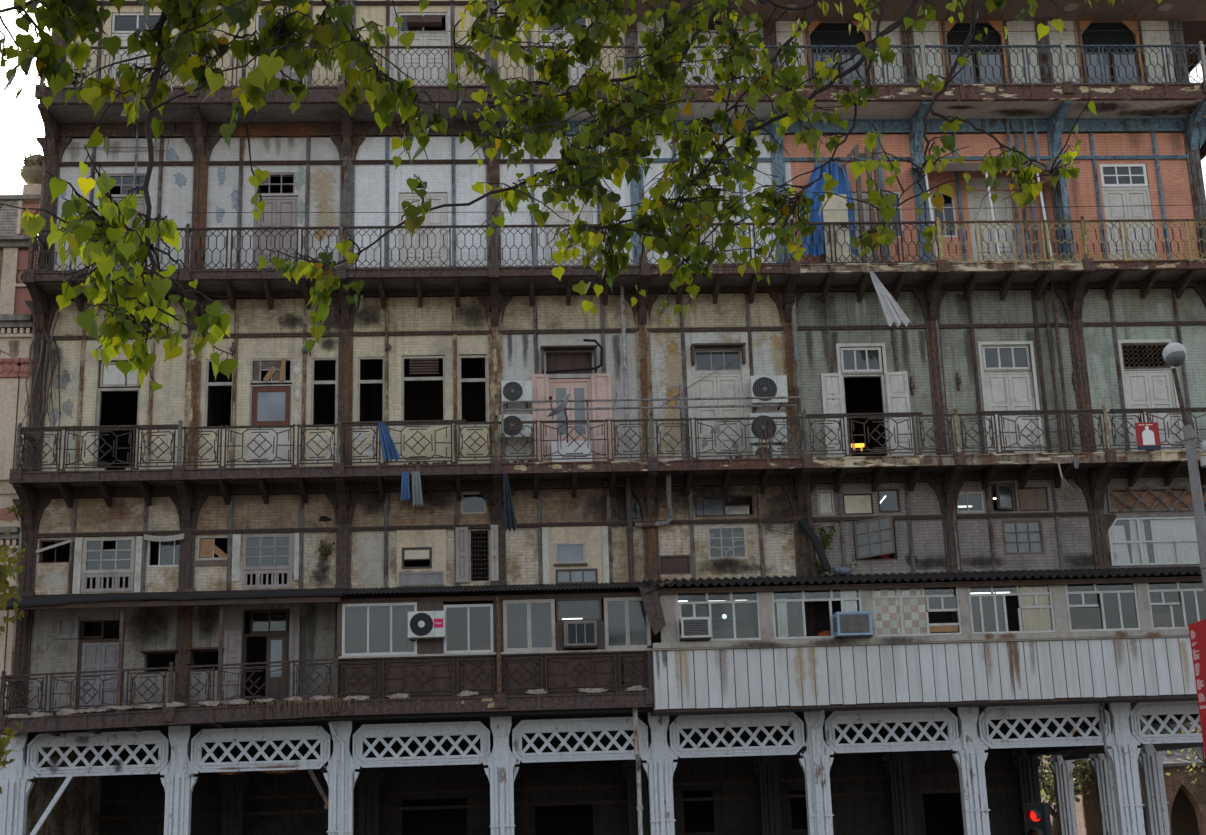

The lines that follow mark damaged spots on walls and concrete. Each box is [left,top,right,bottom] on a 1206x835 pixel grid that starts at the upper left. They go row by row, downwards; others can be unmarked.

corrosion [986,634,1019,682]
flaking render [5,693,410,718]
peeling [457,690,495,708]